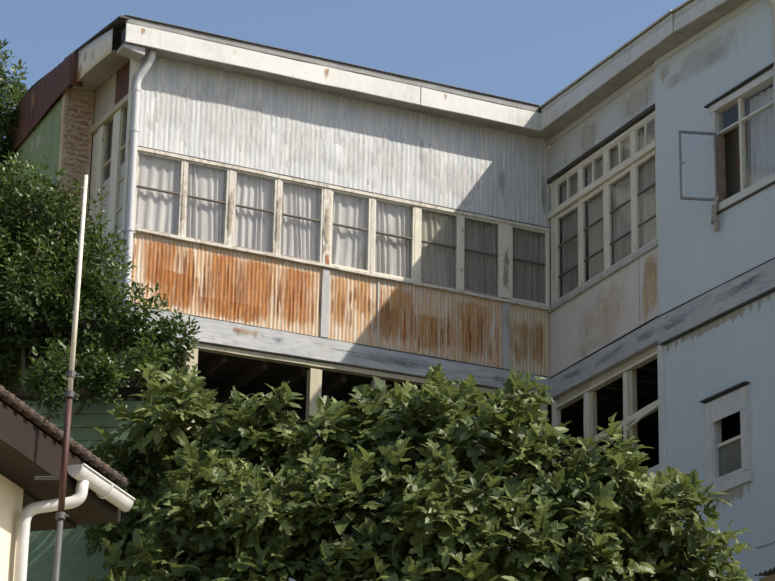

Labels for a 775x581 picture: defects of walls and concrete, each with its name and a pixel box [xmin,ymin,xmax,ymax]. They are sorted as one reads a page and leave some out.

corrosion [145,241,498,358]